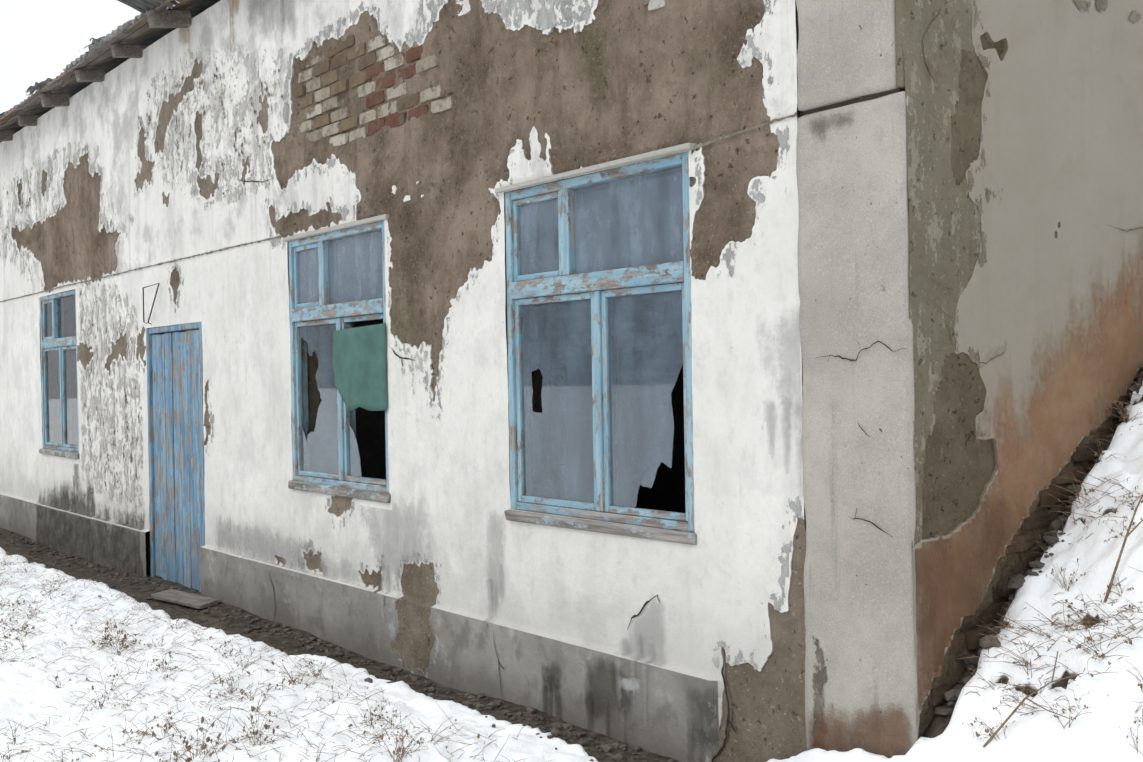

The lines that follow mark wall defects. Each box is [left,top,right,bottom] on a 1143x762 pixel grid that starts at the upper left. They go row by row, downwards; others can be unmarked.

flaking render [951,34,1002,187]
flaking render [135,0,790,418]
flaking render [0,142,146,508]
crack [817,341,906,362]
flaking render [359,552,444,679]
crack [627,595,660,630]
flaking render [702,496,807,762]